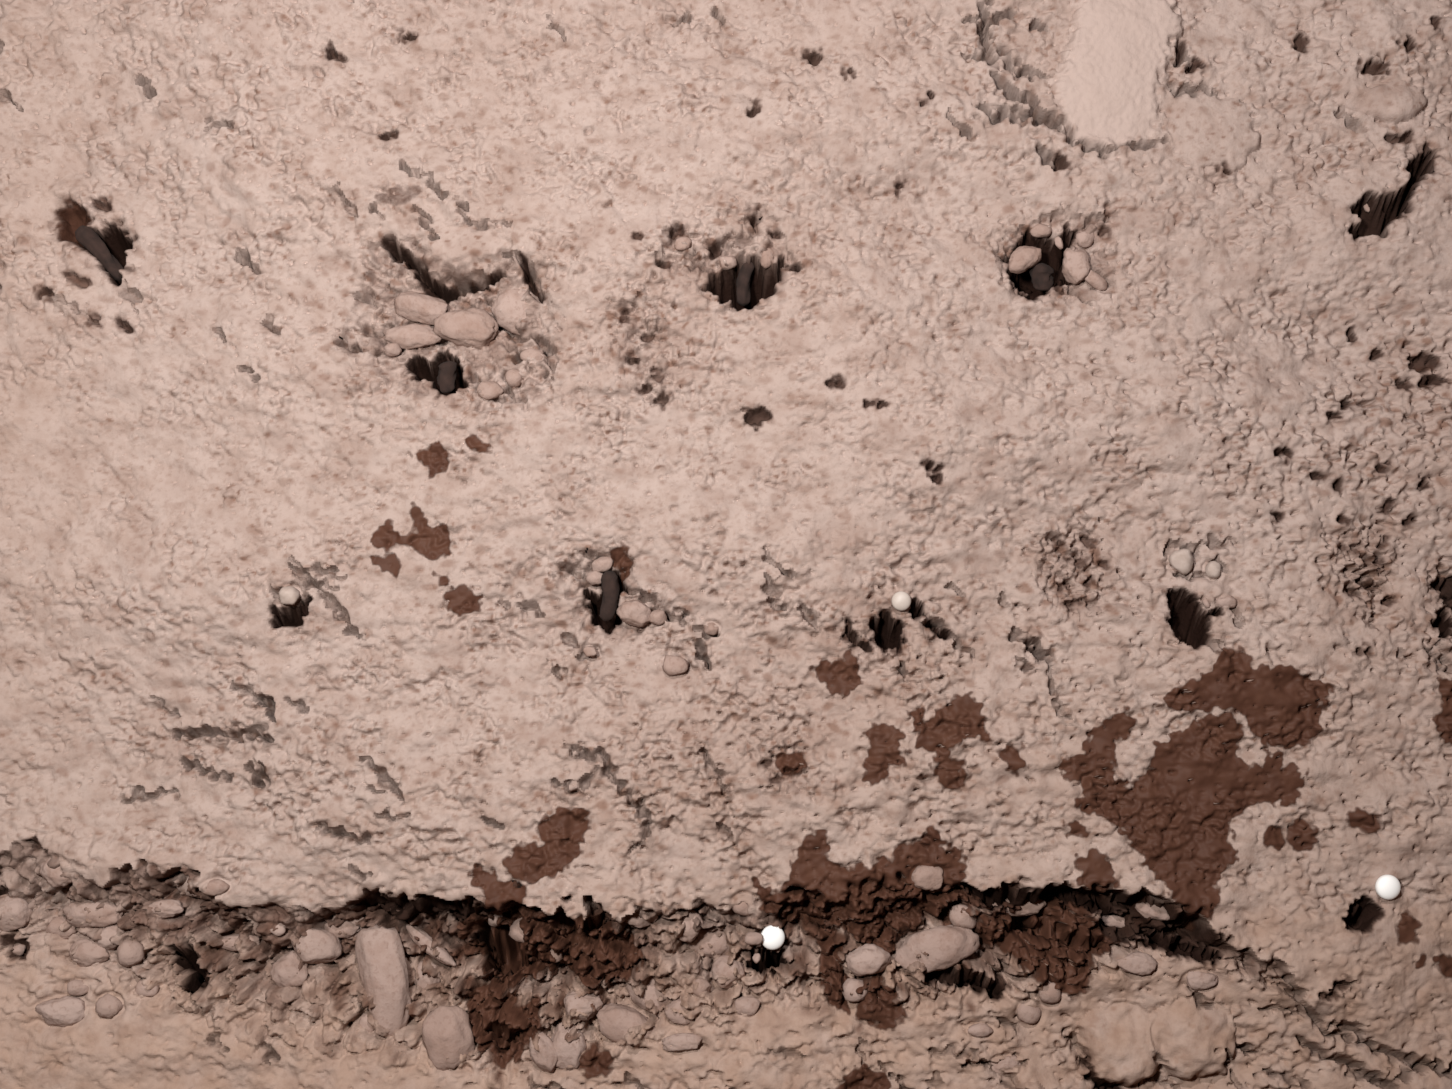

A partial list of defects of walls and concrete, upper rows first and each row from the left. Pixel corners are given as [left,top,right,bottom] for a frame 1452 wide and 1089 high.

hole [1333,105,1448,249]
hole [38,191,144,334]
hole [632,203,805,314]
hole [989,202,1121,308]
spalling [329,234,562,416]
crack [206,1036,271,1066]
crack [624,1071,644,1089]
spalling [0,837,1299,1089]
crack [763,1045,806,1062]
crack [928,1017,1029,1089]
crack [1191,991,1215,1010]
crack [1223,978,1452,1089]